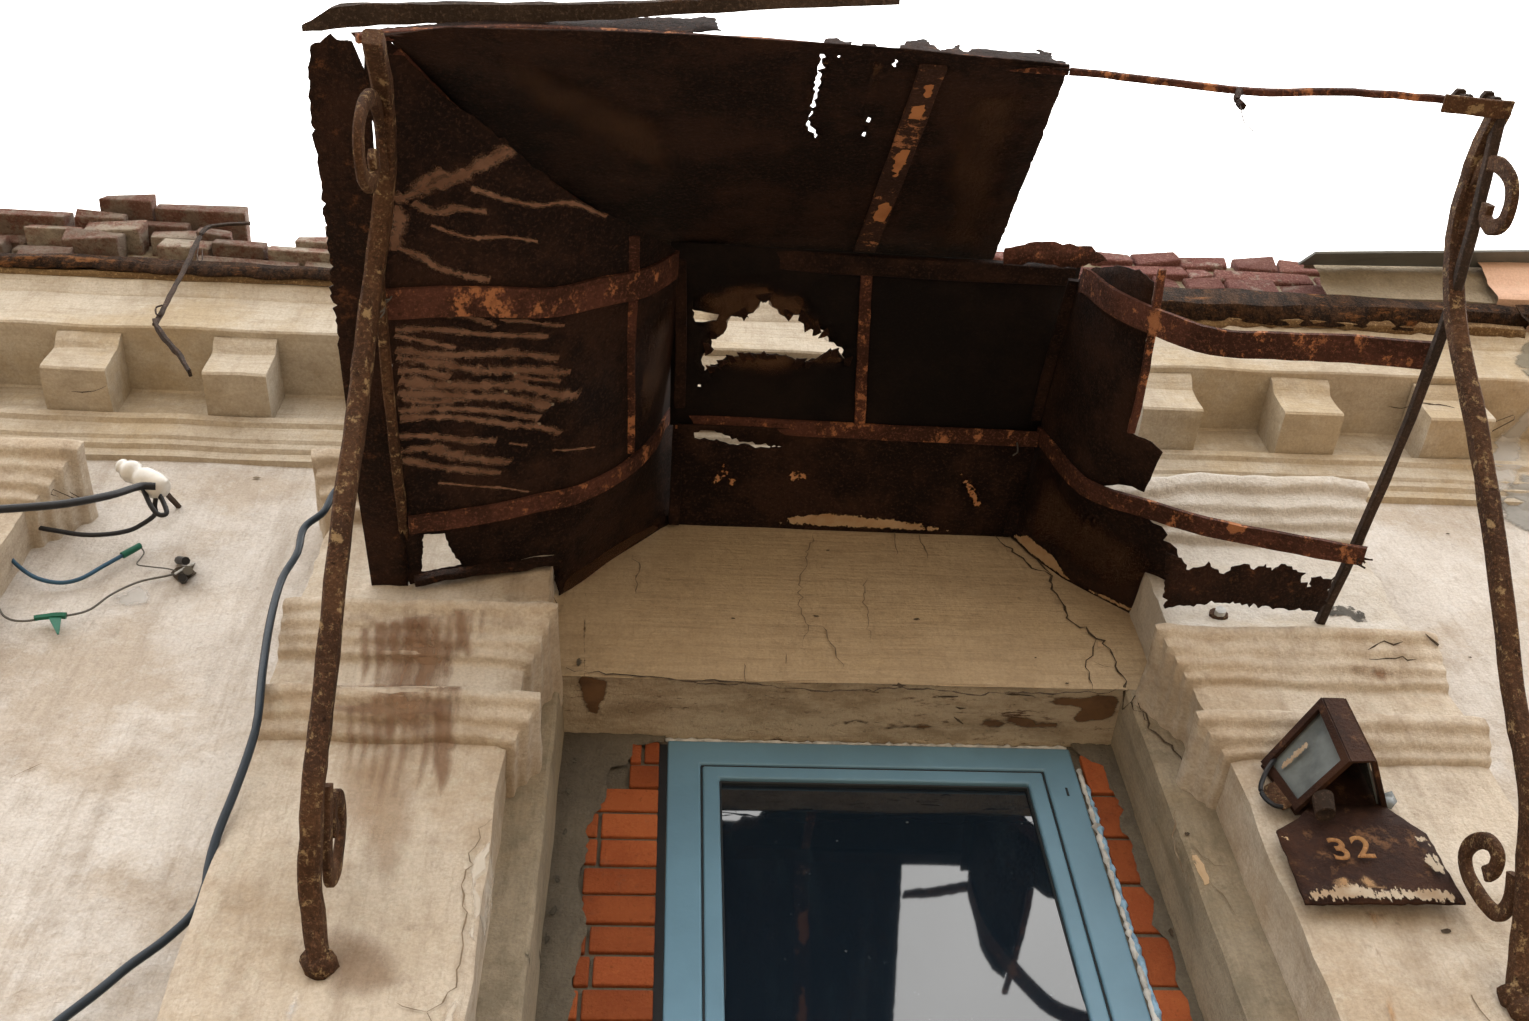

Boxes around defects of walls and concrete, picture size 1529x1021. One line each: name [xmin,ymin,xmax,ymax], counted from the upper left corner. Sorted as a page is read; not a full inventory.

rust [389,144,608,283]
rust [394,316,595,493]
rust [703,287,839,373]
rust [563,520,658,592]
rust [338,611,469,785]
crack [566,532,1182,760]